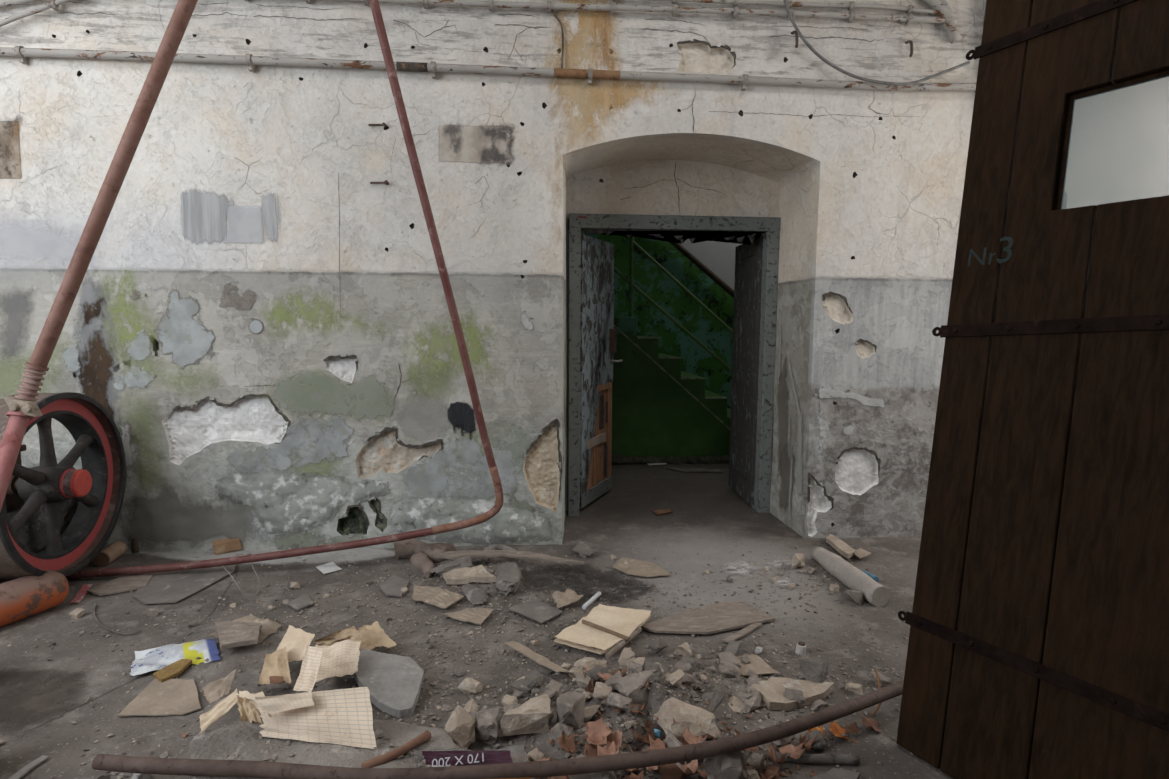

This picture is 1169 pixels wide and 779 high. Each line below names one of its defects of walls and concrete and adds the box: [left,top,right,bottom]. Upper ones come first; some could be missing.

rust [554,0,655,135]
spalling [669,38,736,74]
damp [0,293,31,353]
damp [74,282,123,435]
peeling [113,289,215,391]
spalling [323,353,358,383]
spalling [822,291,854,334]
spalling [162,394,561,514]
spalling [777,327,885,537]
damp [138,518,395,564]
spalling [273,495,388,550]